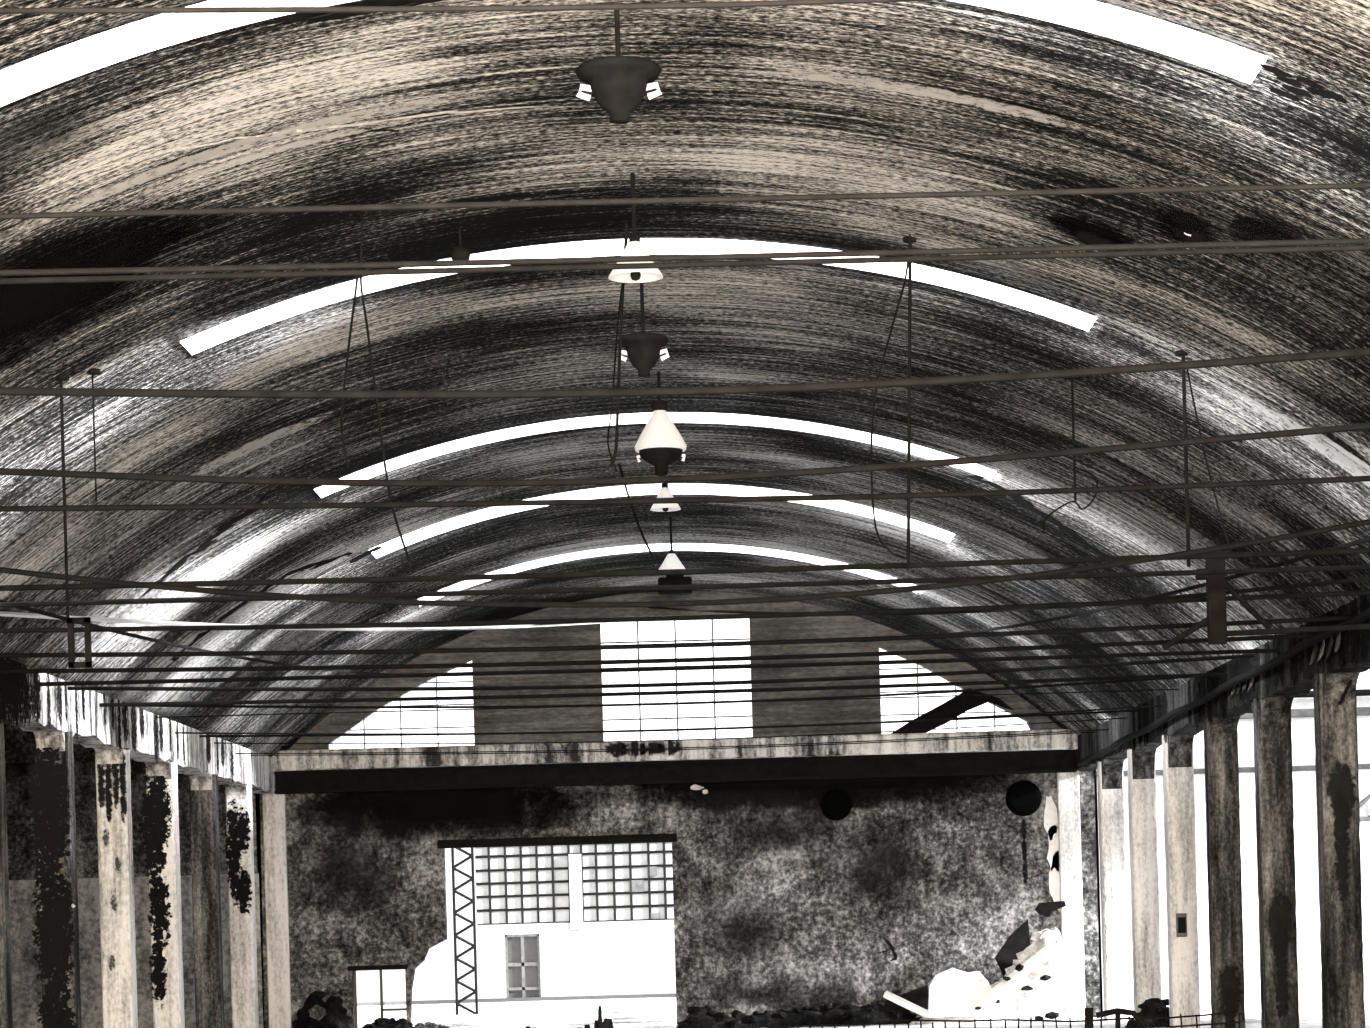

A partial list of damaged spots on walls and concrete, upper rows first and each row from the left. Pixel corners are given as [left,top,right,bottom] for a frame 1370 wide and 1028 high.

damp [1051,216,1131,251]
damp [1157,210,1215,242]
damp [1232,217,1295,255]